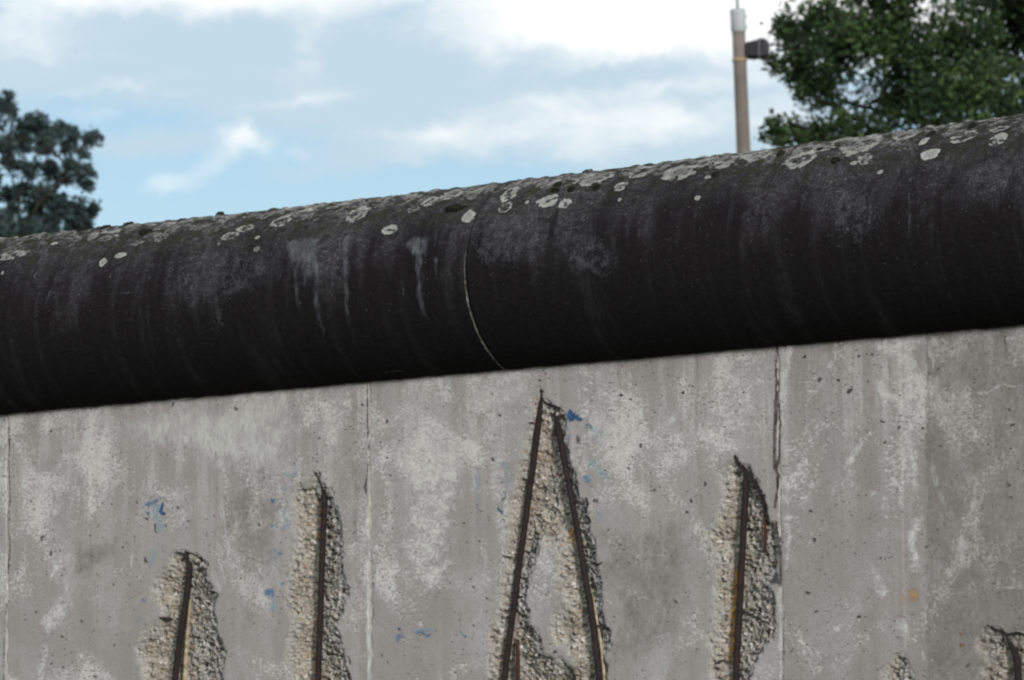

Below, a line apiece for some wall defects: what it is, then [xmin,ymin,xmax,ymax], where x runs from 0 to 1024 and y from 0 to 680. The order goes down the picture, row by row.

spalling [134,550,227,680]
spalling [283,470,351,680]
spalling [484,387,612,680]
corrosion [729,567,738,664]
spalling [705,456,781,680]
crack [734,346,785,660]
spalling [970,626,1024,680]